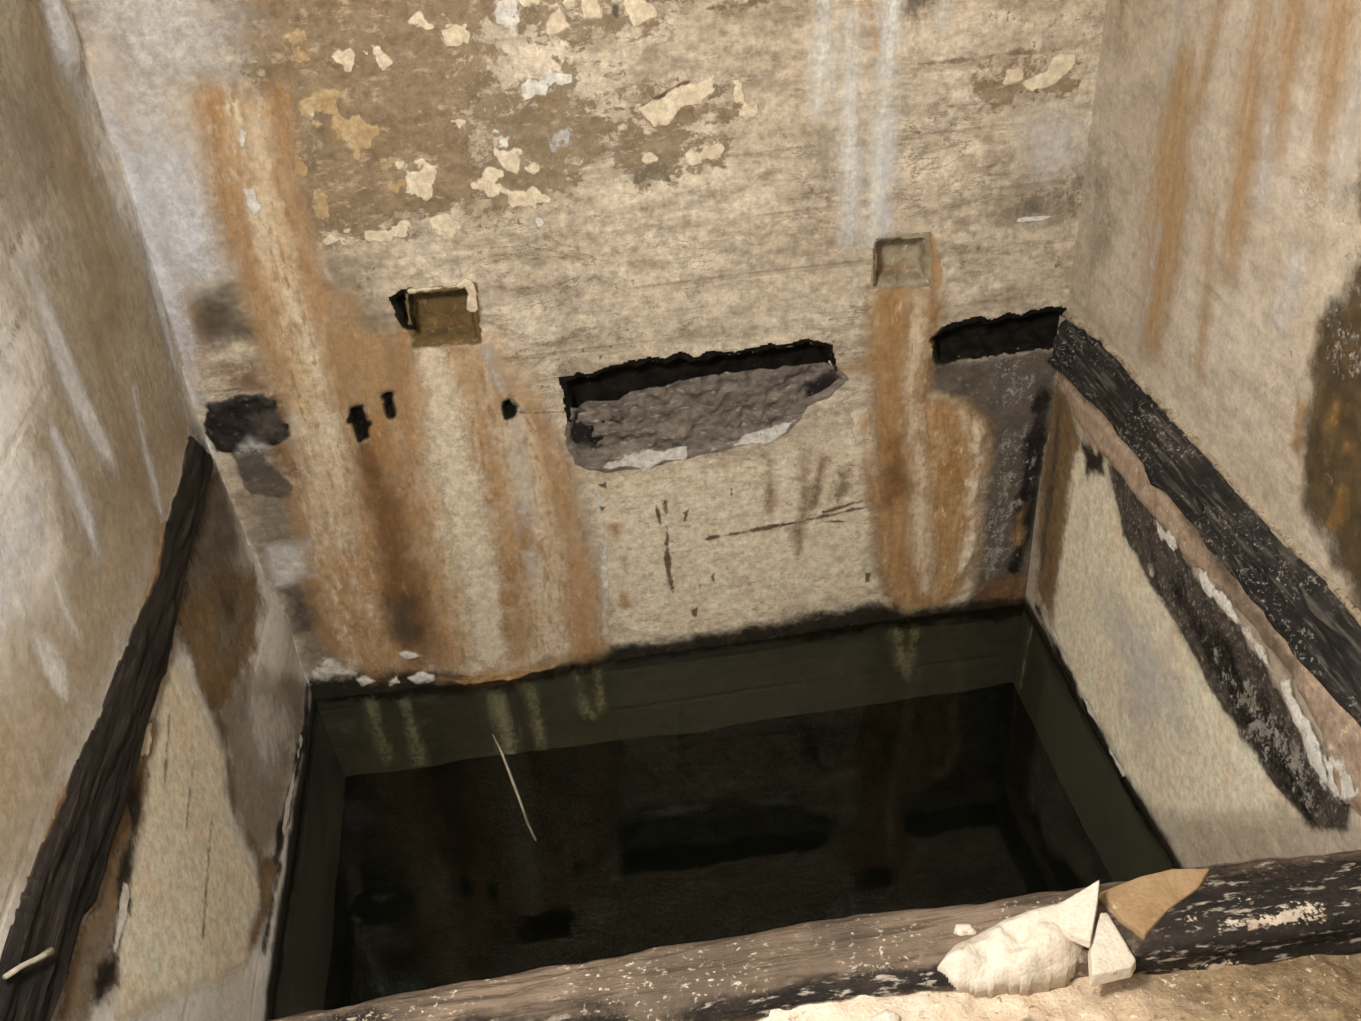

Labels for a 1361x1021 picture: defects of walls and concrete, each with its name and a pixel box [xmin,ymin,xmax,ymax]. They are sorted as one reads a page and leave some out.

peeling [459,0,758,227]
peeling [706,0,769,17]
peeling [950,48,1080,110]
rust [1230,24,1263,257]
peeling [240,440,264,450]
rust [195,86,430,673]
spalling [558,338,882,648]
spalling [928,306,1067,365]
damp [1292,233,1361,611]